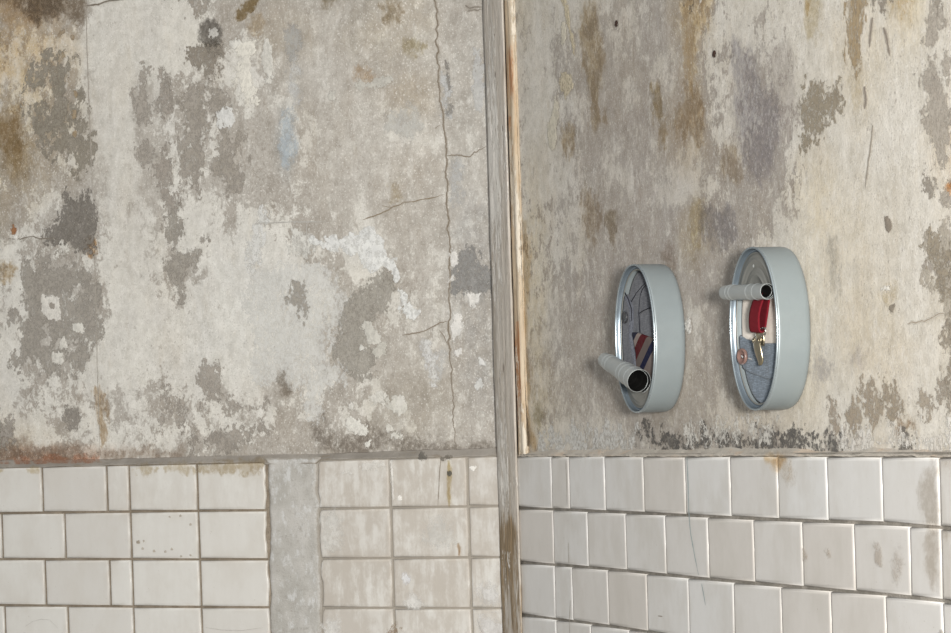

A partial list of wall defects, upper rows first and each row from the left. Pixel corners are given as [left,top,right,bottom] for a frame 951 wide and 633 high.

crack [86,0,119,8]
peeling [795,74,846,157]
peeling [5,29,105,387]
peeling [129,36,275,306]
crack [363,0,485,500]
peeling [912,0,951,423]
flaking render [308,226,421,383]
peeling [62,404,82,431]
peeling [345,402,371,447]
peeling [368,391,408,440]
water stain [538,410,951,452]
peeling [826,372,905,446]